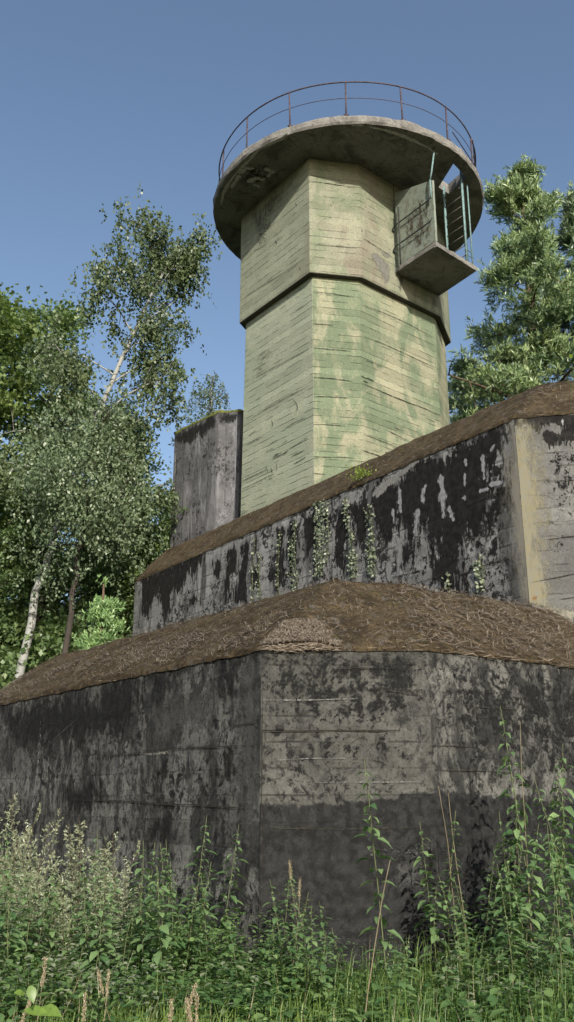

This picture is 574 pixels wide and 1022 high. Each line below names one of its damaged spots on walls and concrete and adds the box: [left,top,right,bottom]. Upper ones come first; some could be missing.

leakage [140,413,574,625]
leakage [0,670,175,823]
leakage [216,656,574,971]